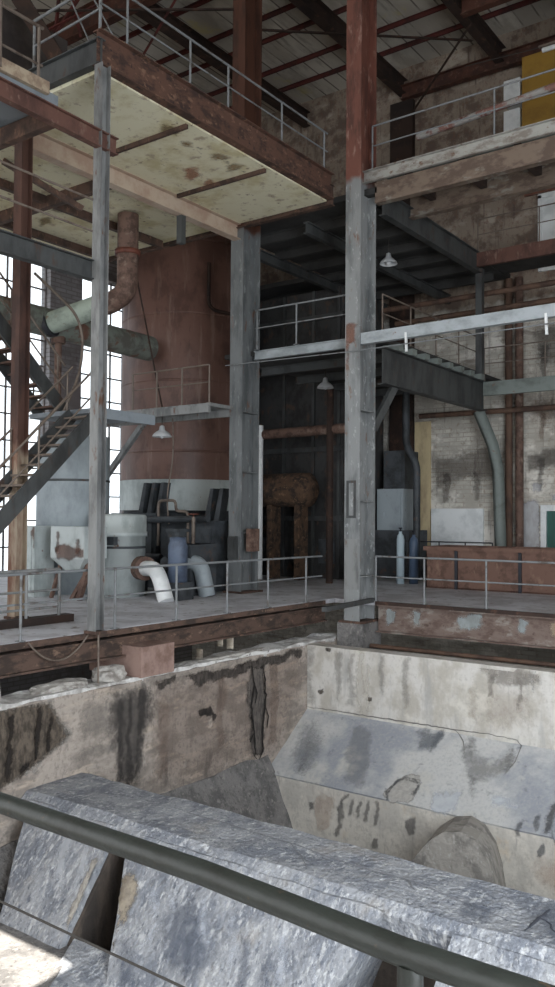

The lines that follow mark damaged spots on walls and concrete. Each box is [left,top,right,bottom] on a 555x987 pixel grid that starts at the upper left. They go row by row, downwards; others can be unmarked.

peeling [458,614,482,629]
leakage [112,690,151,785]
peeling [383,774,420,803]
leakage [335,794,379,836]
leakage [405,819,415,834]
peeling [545,804,555,842]